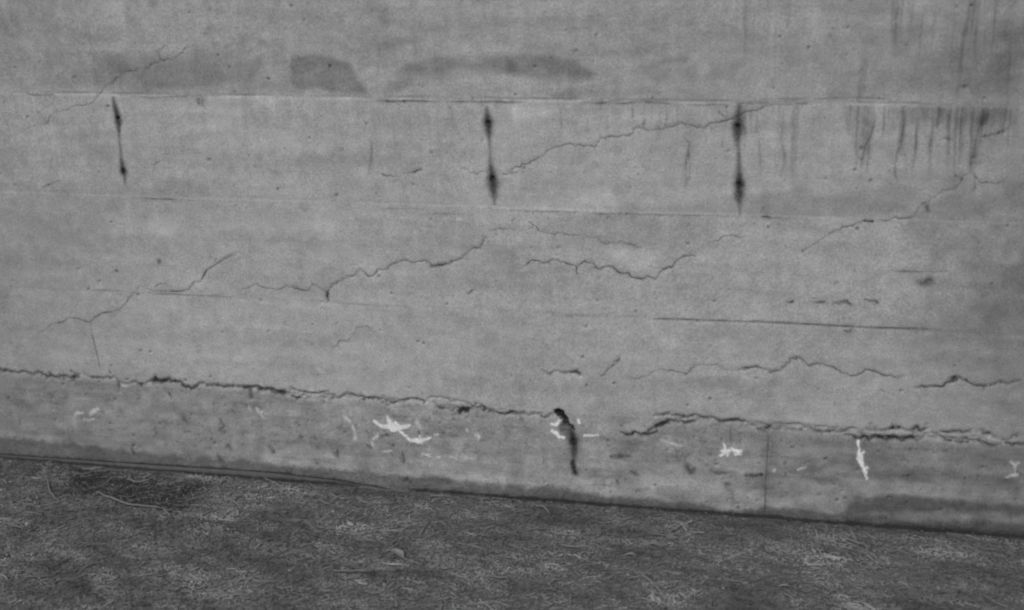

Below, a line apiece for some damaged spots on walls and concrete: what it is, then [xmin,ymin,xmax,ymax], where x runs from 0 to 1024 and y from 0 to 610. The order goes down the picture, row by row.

crack [141,379,301,399]
crack [339,393,514,414]
water stain [372,416,471,459]
water stain [550,419,565,439]
crack [625,414,768,435]
crack [826,425,1011,444]
water stain [719,443,743,457]
water stain [857,440,869,479]